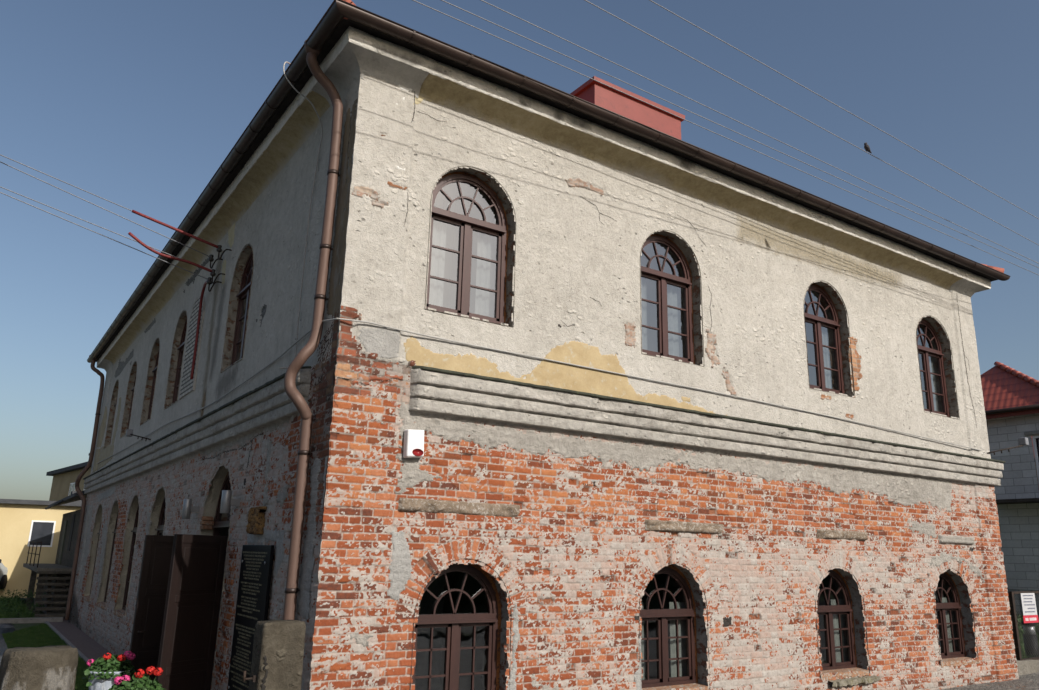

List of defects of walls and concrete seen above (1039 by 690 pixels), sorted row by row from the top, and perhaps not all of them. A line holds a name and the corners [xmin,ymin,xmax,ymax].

flaking render [311,99,953,557]
flaking render [77,485,116,608]
flaking render [247,528,285,576]
spalling [317,632,373,674]
flaking render [531,674,559,690]